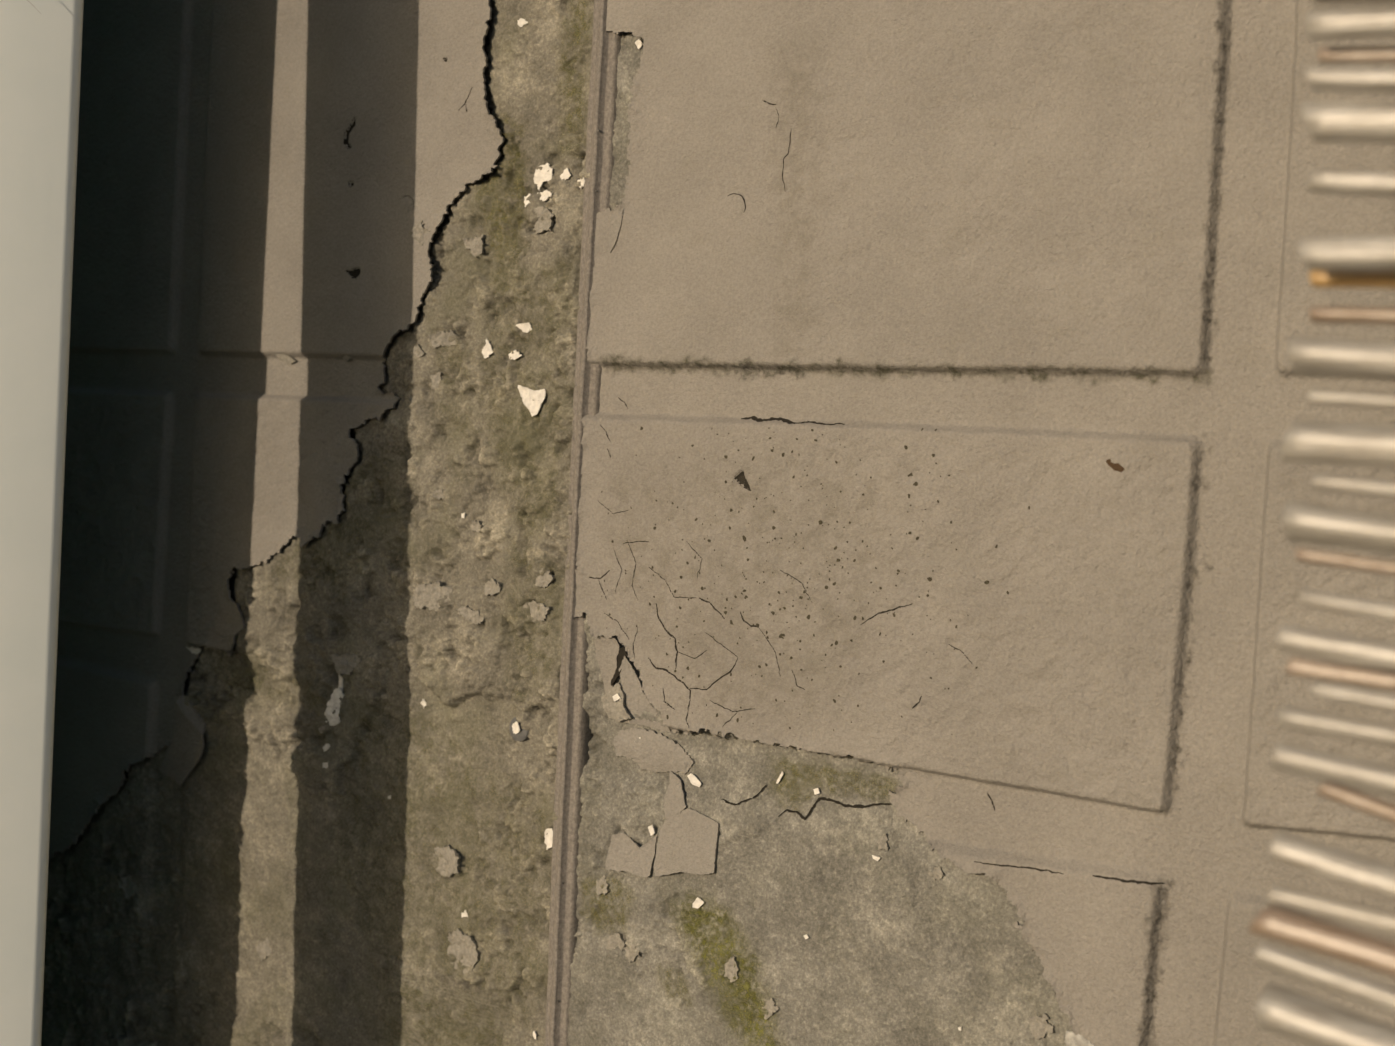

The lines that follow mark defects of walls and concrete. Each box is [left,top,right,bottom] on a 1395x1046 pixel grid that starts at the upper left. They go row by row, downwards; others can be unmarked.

peeling [41,0,1095,1046]
crack [589,502,805,726]
crack [860,603,912,625]
crack [722,785,891,820]